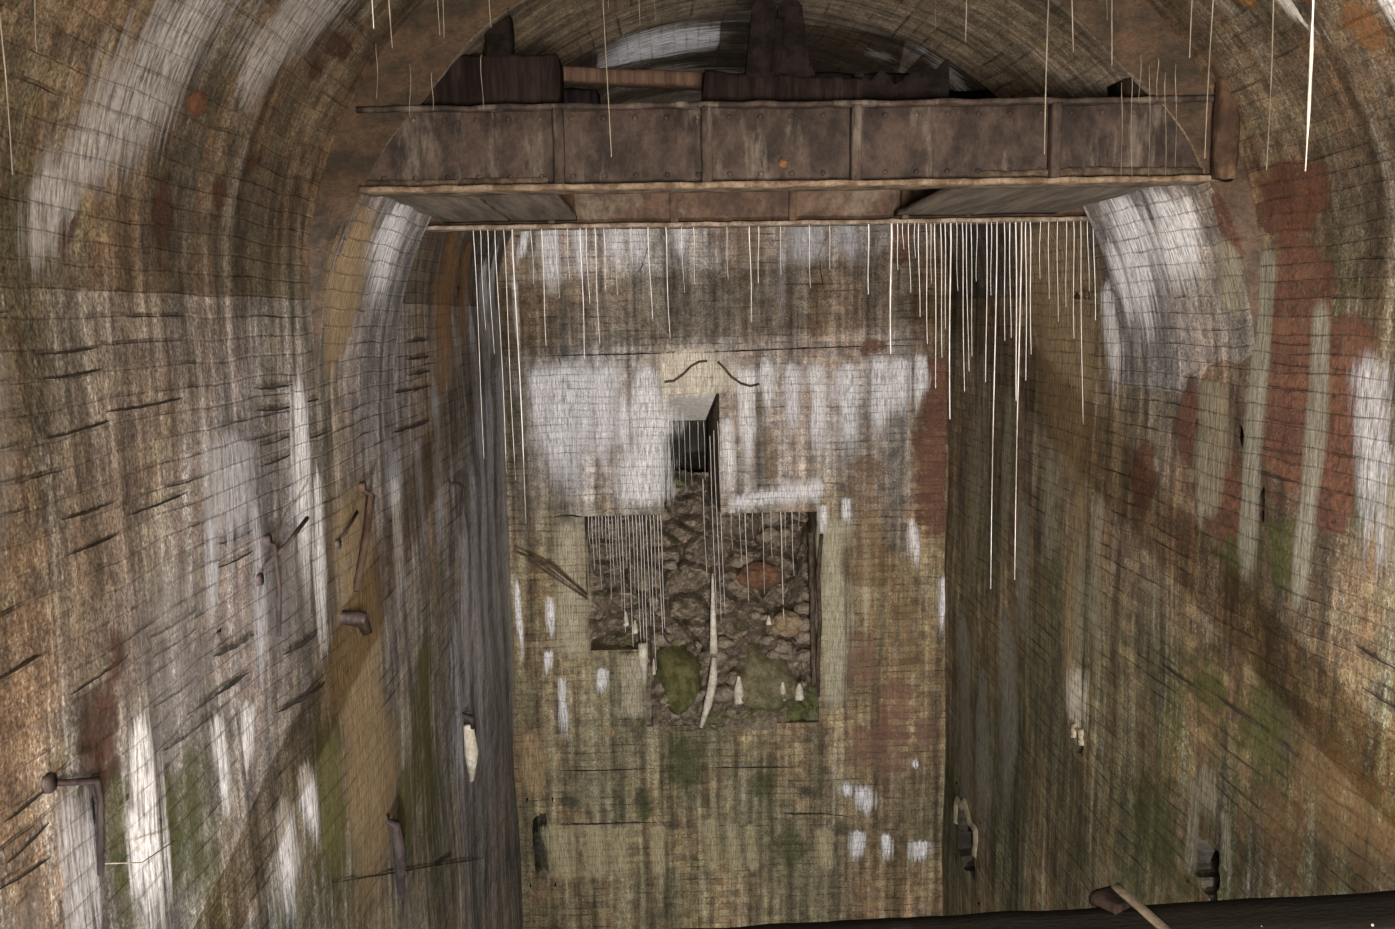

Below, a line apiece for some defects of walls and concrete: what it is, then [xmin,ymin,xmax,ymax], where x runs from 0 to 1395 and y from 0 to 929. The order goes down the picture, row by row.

water stain [529,349,928,534]
water stain [1351,357,1395,578]
peeling [621,655,643,719]
water stain [836,782,927,860]